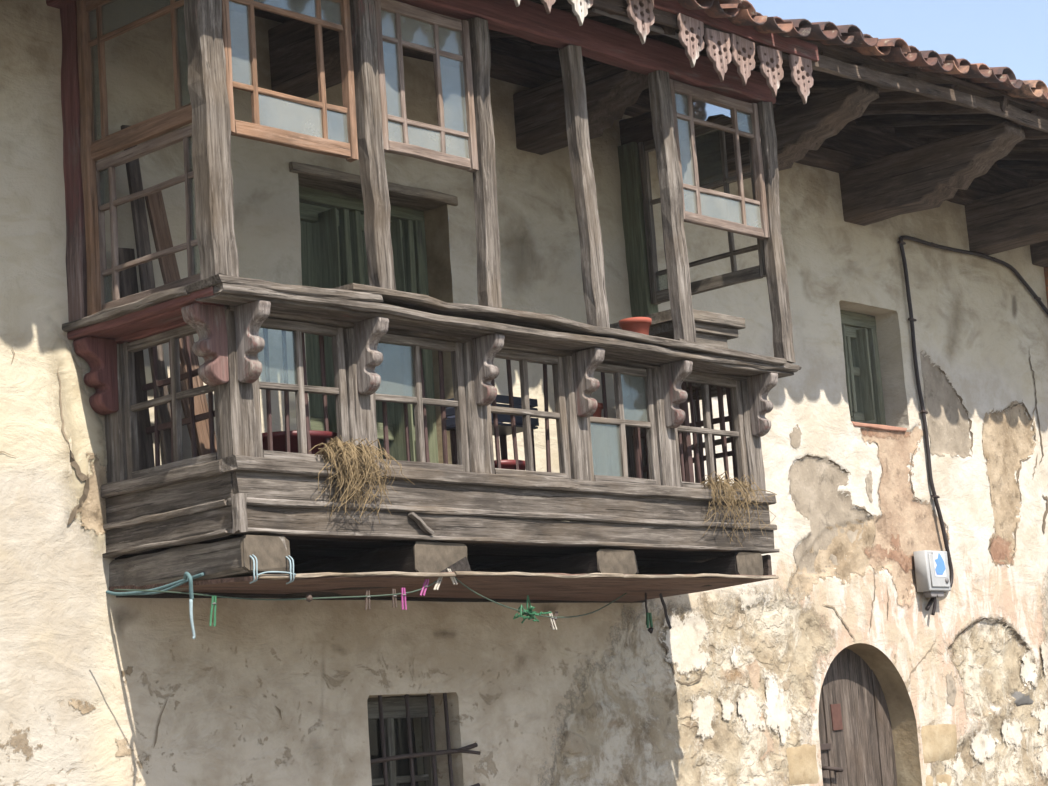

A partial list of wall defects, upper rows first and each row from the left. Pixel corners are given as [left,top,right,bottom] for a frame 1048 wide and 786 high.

crack [57,366,70,450]
spalling [787,351,1038,608]
peeling [658,608,711,678]
peeling [0,727,43,761]
peeling [689,668,793,744]
spalling [946,614,1048,786]